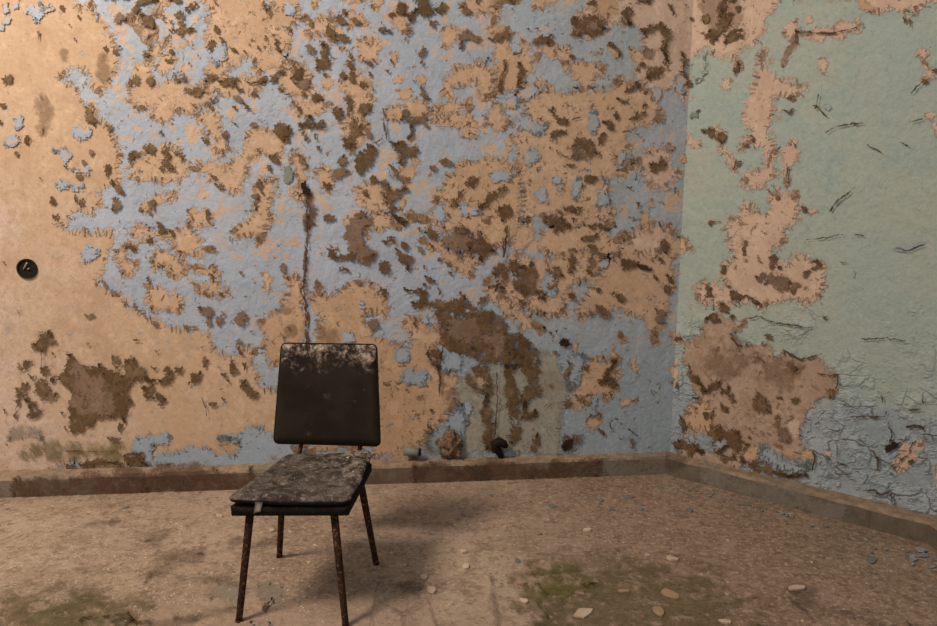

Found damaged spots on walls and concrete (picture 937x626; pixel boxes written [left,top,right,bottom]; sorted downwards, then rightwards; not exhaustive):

corrosion [300,193,318,343]
peeling [0,0,937,497]
crack [812,393,925,502]